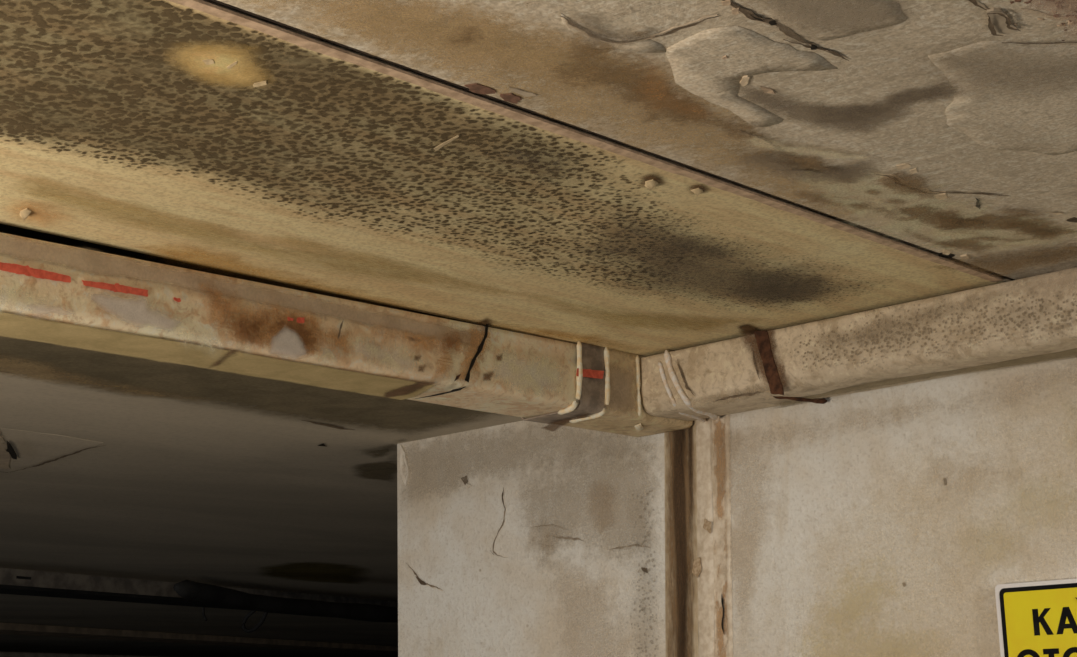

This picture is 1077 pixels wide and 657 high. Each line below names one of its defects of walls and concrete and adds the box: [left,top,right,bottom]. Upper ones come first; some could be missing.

crack [560,0,849,61]
crack [968,0,988,10]
peeling [987,0,1077,41]
leakage [0,0,1077,311]
rust [213,301,322,366]
peeling [271,329,305,358]
crack [416,324,489,399]
rust [739,325,787,387]
leakage [798,298,1077,368]
crack [492,488,508,558]
crack [533,524,583,541]
crack [405,563,443,591]